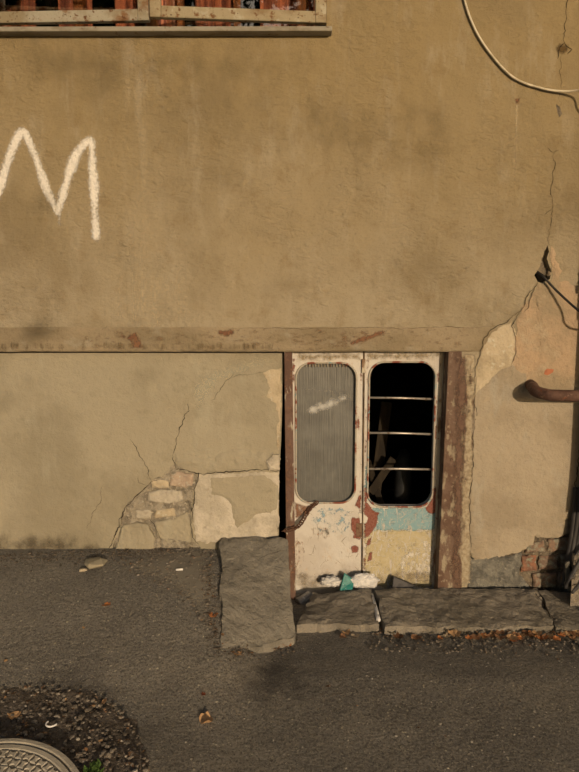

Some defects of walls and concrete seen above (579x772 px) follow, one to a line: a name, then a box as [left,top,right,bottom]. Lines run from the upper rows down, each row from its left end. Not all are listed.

crack [558,0,572,81]
crack [109,443,153,548]
peeling [114,368,283,549]
crack [172,404,279,543]
flaking render [451,323,579,606]